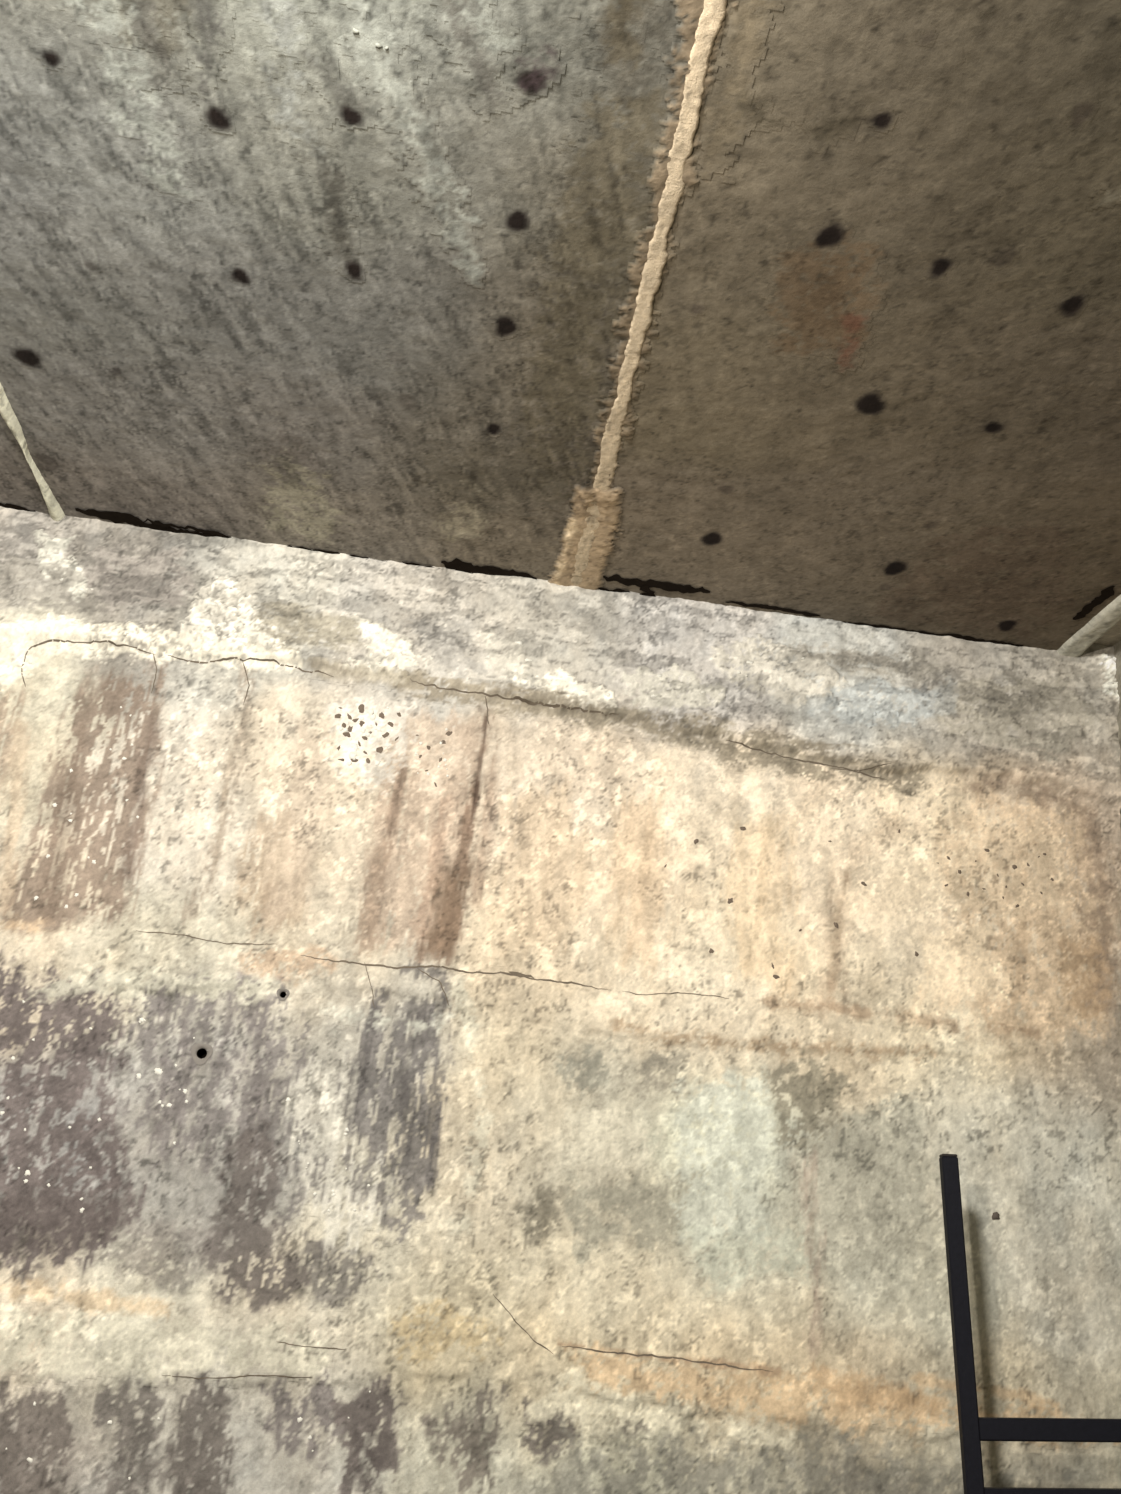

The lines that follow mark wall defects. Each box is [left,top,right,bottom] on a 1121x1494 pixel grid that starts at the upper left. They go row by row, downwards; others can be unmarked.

water stain [0,662,457,1317]
crack [136,930,729,1008]